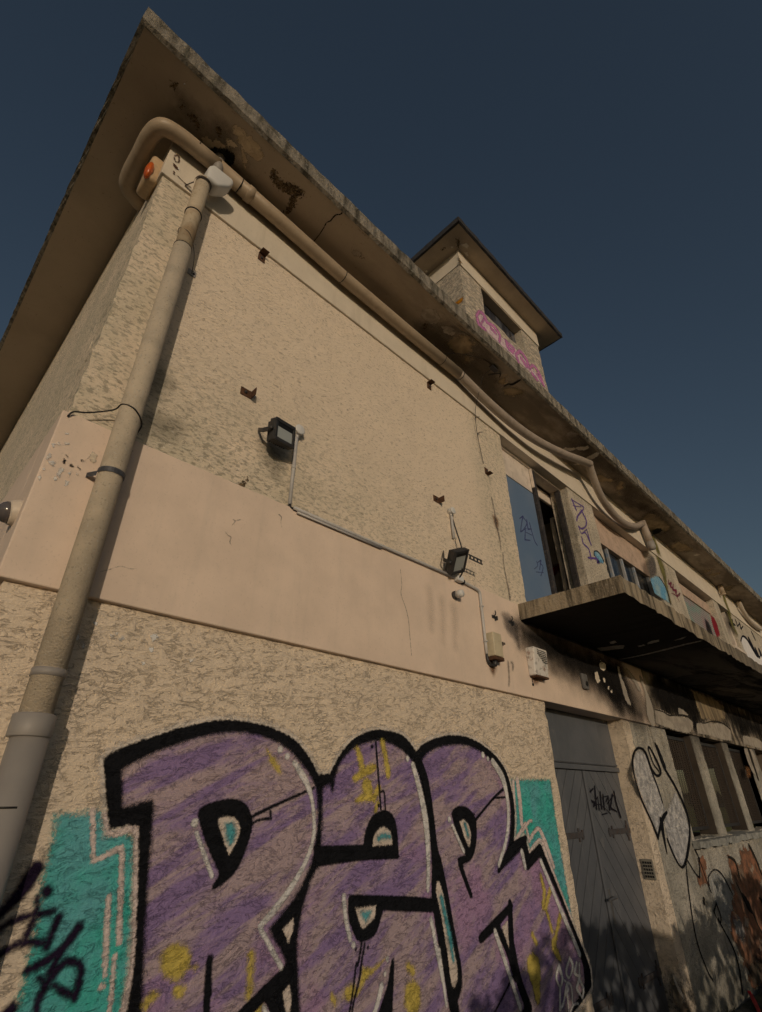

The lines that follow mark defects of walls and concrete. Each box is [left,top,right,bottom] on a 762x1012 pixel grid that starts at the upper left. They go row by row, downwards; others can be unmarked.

peeling [179,104,264,169]
spalling [270,168,304,214]
leakage [505,617,698,732]